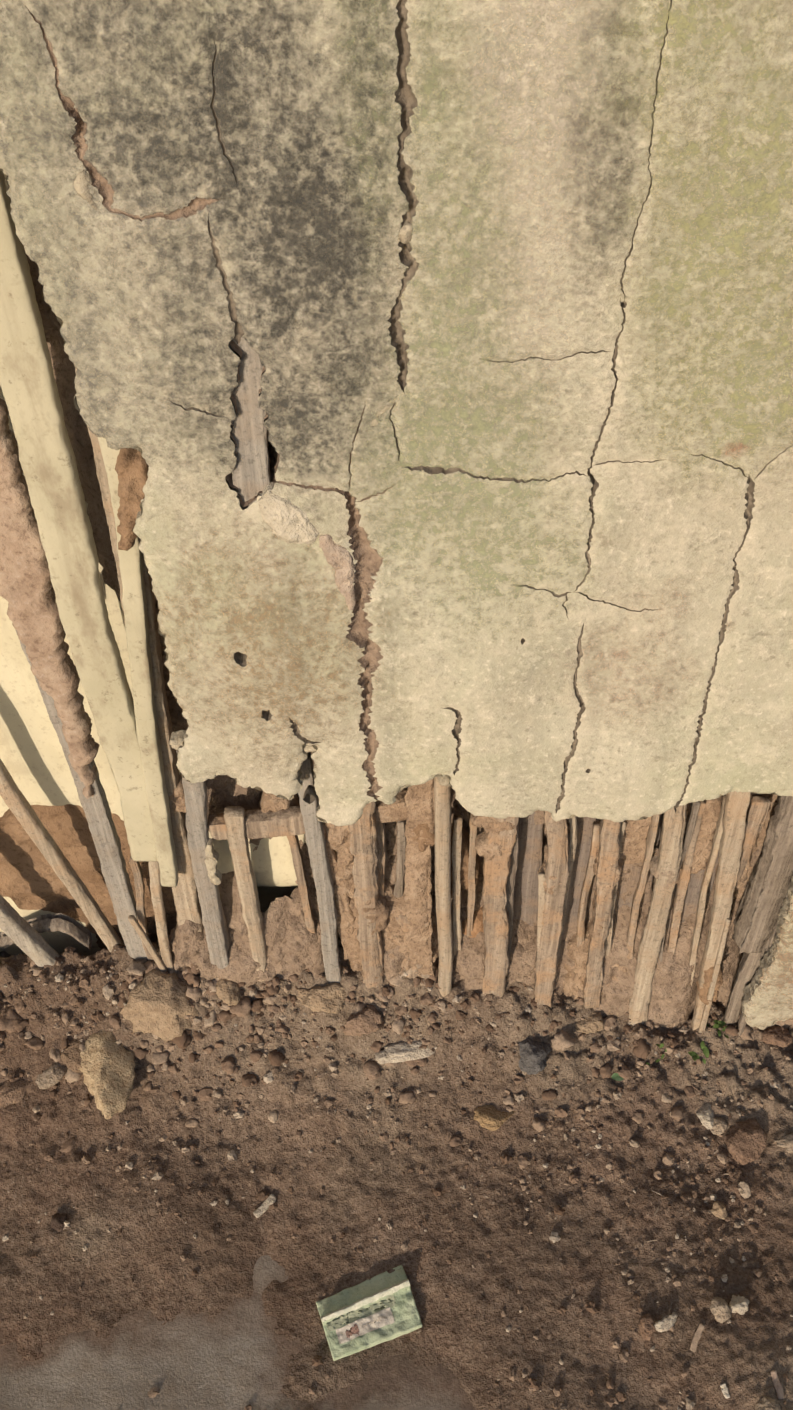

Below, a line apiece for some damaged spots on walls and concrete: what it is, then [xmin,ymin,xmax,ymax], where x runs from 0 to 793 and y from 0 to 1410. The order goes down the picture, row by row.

crack [25,6,245,345]
crack [166,399,225,417]
crack [273,0,791,813]
spalling [115,447,149,551]
flaking render [169,716,191,783]
flaking render [235,743,334,825]
peeling [0,804,125,949]
peeling [111,813,177,943]
flaking render [741,876,793,1028]